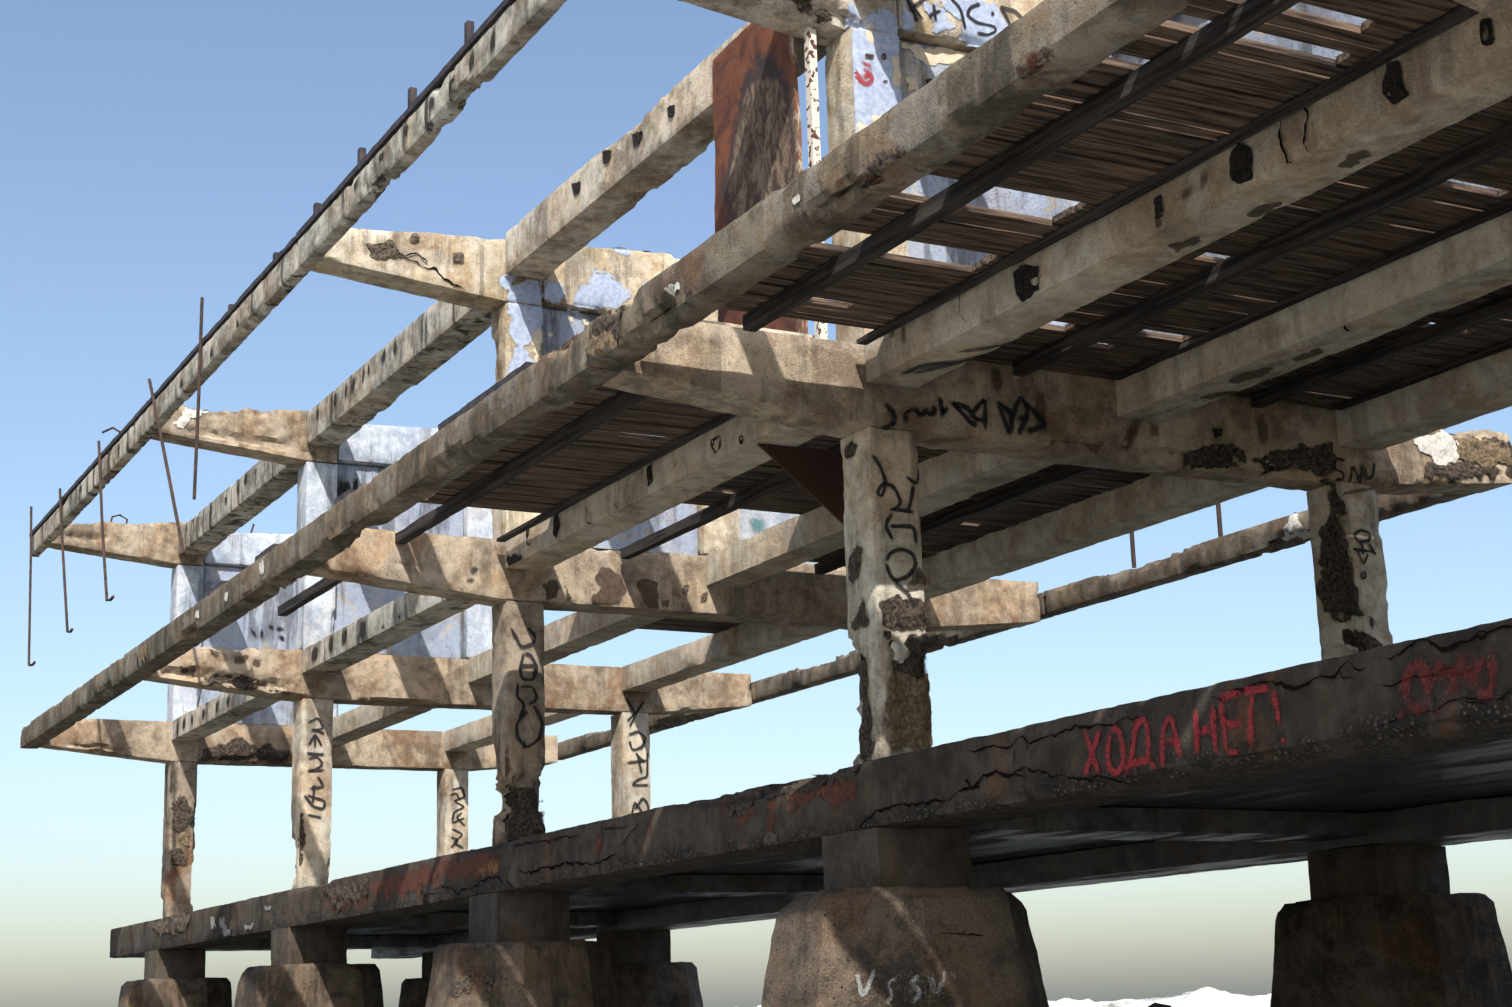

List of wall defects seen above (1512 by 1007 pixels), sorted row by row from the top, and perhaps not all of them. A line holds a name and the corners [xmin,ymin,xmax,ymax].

peeling [794,0,1008,133]
crack [364,243,468,291]
peeling [499,270,680,373]
spalling [844,441,856,459]
spalling [1414,430,1512,485]
spalling [848,545,862,583]
spalling [1184,442,1383,652]
spalling [728,567,933,818]
crack [1210,625,1512,727]
spalling [502,785,545,841]
crack [857,716,1139,828]
rust [329,853,500,911]